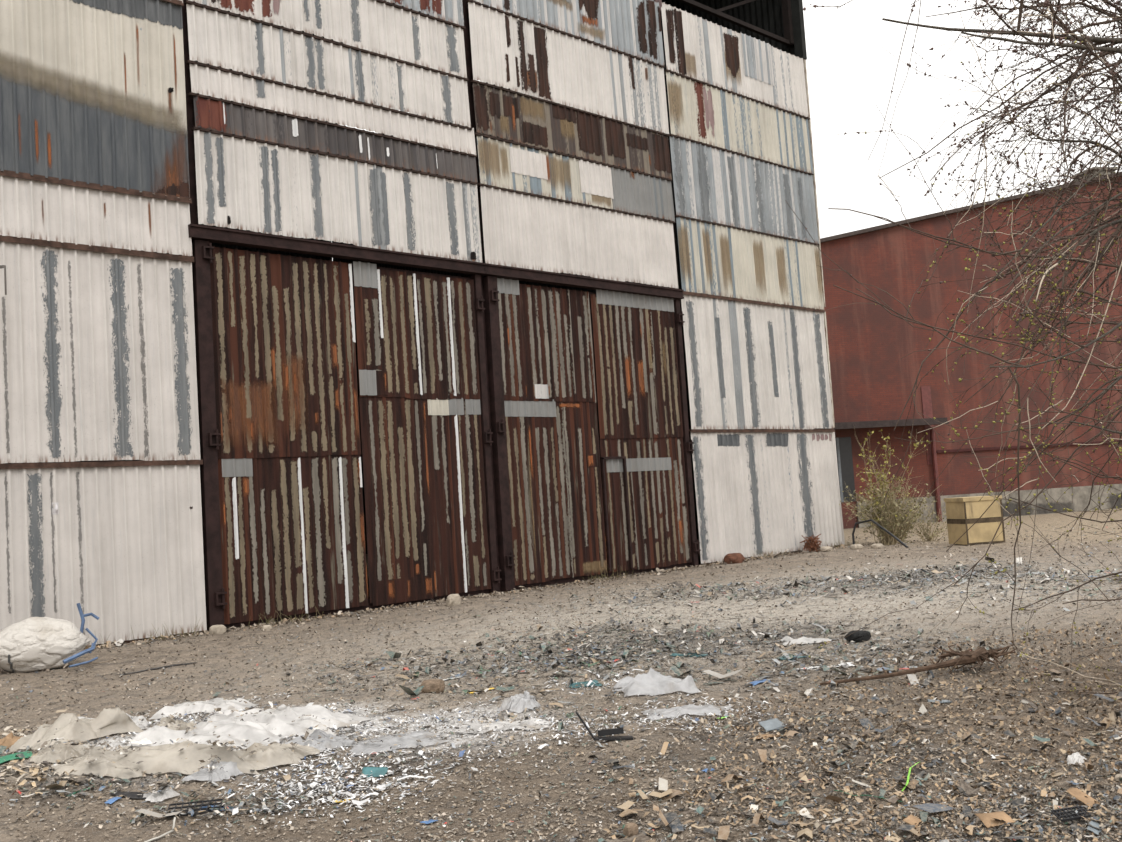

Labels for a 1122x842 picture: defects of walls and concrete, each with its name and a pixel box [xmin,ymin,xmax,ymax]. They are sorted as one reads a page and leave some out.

corrosion [211,0,280,18]
corrosion [419,0,442,15]
corrosion [473,0,671,184]
corrosion [592,194,611,205]
peeling [40,249,77,458]
peeling [107,258,149,458]
peeling [169,268,193,456]
corrosion [221,349,303,444]
peeling [498,287,708,581]
peeling [717,308,831,555]
peeling [27,472,57,617]
corrosion [408,564,437,595]